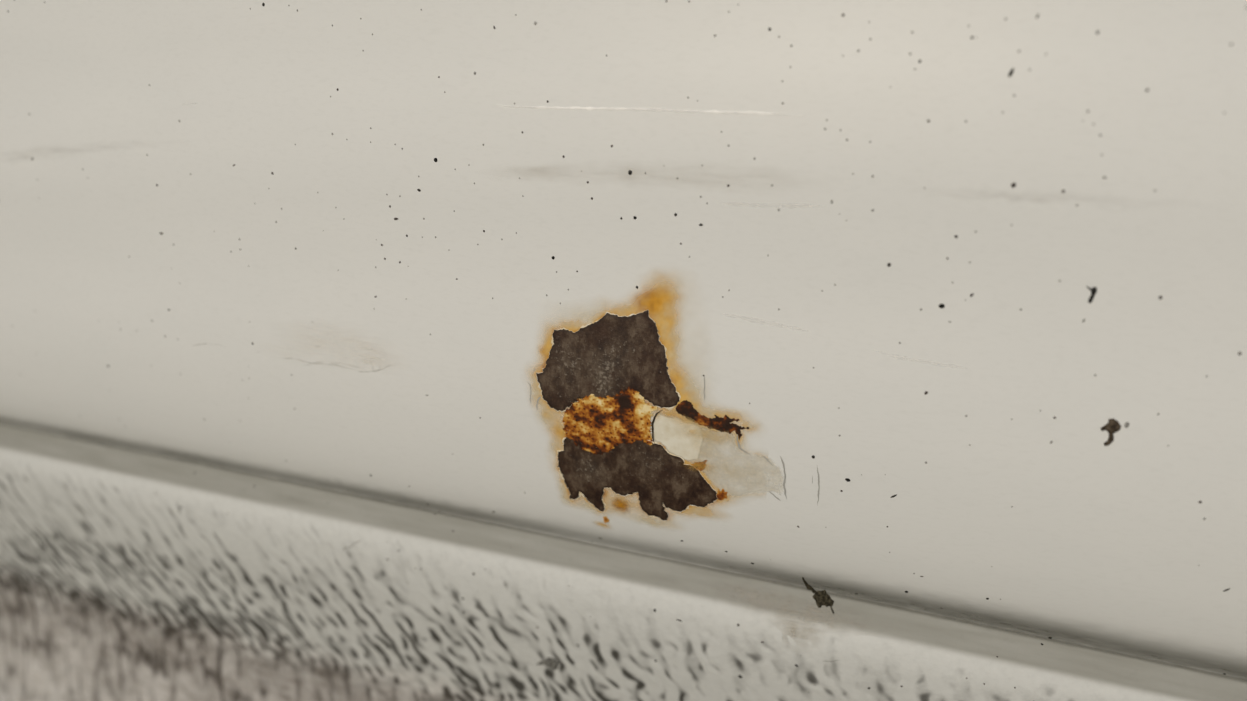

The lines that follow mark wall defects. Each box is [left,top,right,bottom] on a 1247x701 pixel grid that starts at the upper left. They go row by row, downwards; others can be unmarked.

rust [534,283,787,526]